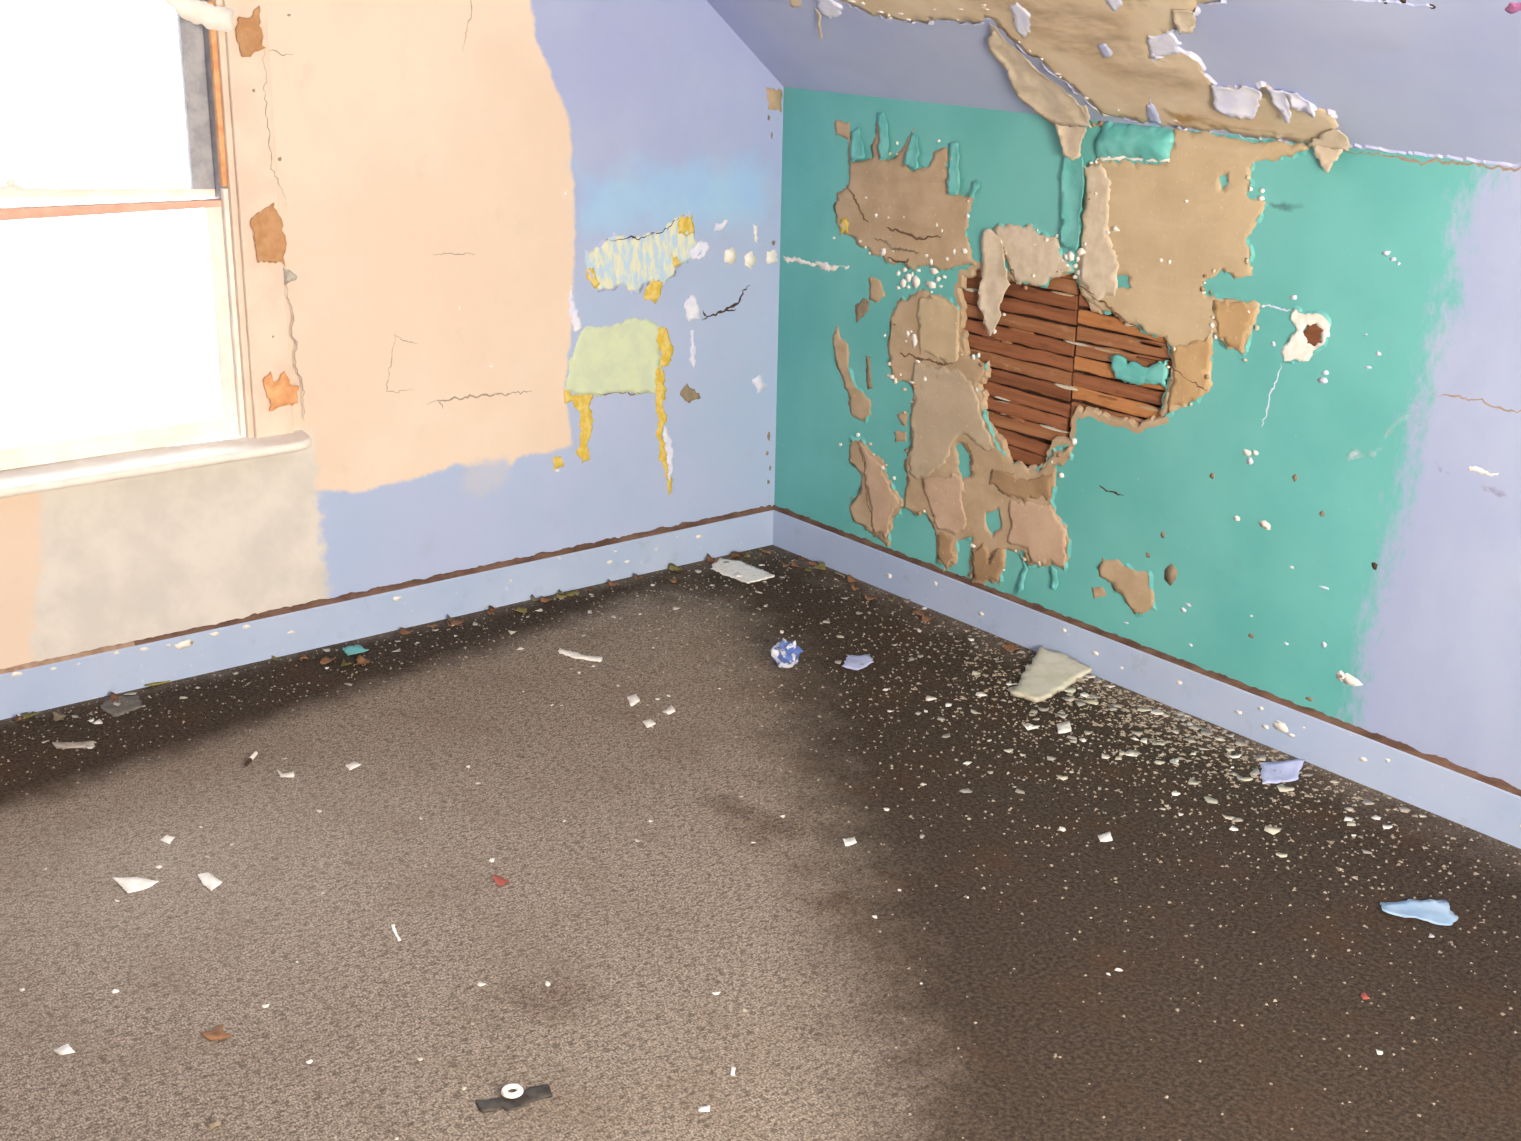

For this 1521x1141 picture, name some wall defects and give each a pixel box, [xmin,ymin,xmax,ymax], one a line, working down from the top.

peeling [766,87,783,139]
peeling [789,0,1351,596]
peeling [553,211,778,496]
peeling [1091,552,1177,624]
peeling [1336,670,1363,686]
peeling [1235,706,1305,737]